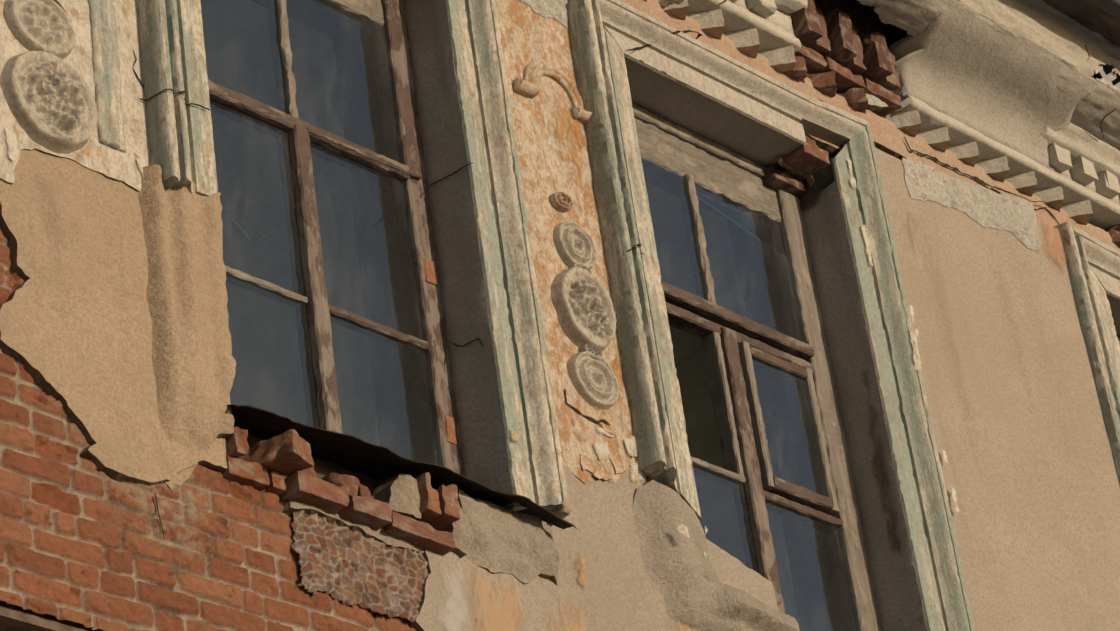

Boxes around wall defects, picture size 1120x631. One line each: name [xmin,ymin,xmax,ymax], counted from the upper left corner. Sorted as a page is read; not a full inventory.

flaking render [521,0,569,29]
crack [133,50,210,110]
spalling [782,0,902,116]
flaking render [1094,64,1120,91]
peeling [5,127,17,162]
peeling [137,153,146,177]
flaking render [902,158,1041,251]
crack [904,137,1060,224]
spalling [0,227,24,304]
spalling [1105,224,1120,247]
peeling [579,425,644,481]
spalling [0,346,429,631]